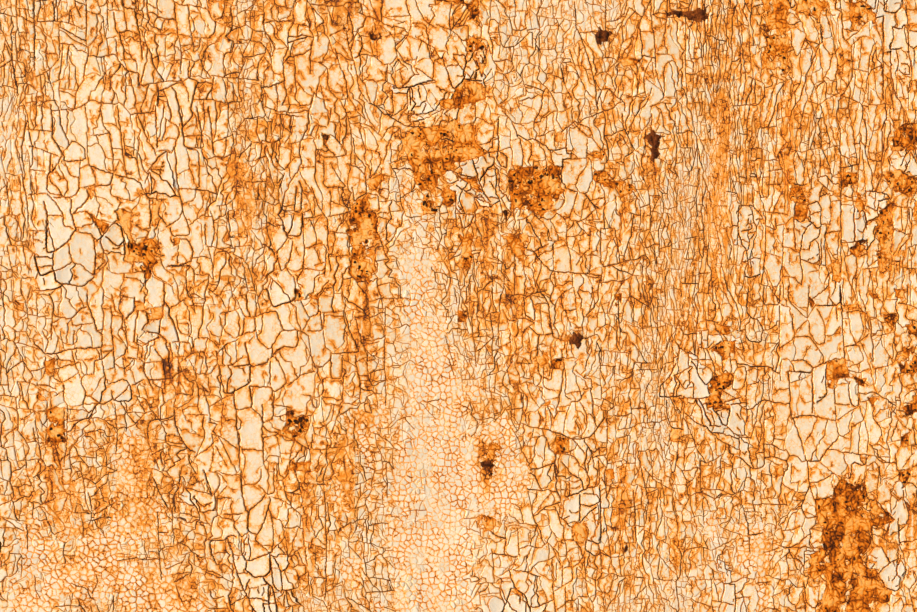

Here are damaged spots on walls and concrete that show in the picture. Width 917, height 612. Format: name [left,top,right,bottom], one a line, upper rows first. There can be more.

crack [392,0,533,229]
crack [740,0,917,111]
corrosion [91,209,160,279]
crack [0,0,421,612]
corrosion [336,174,384,523]
corrosion [402,63,564,398]
peeling [667,330,753,467]
corrosion [707,373,733,410]
corrosion [850,170,917,273]
crack [744,511,762,551]
crack [803,550,821,608]
corrosion [808,479,893,612]